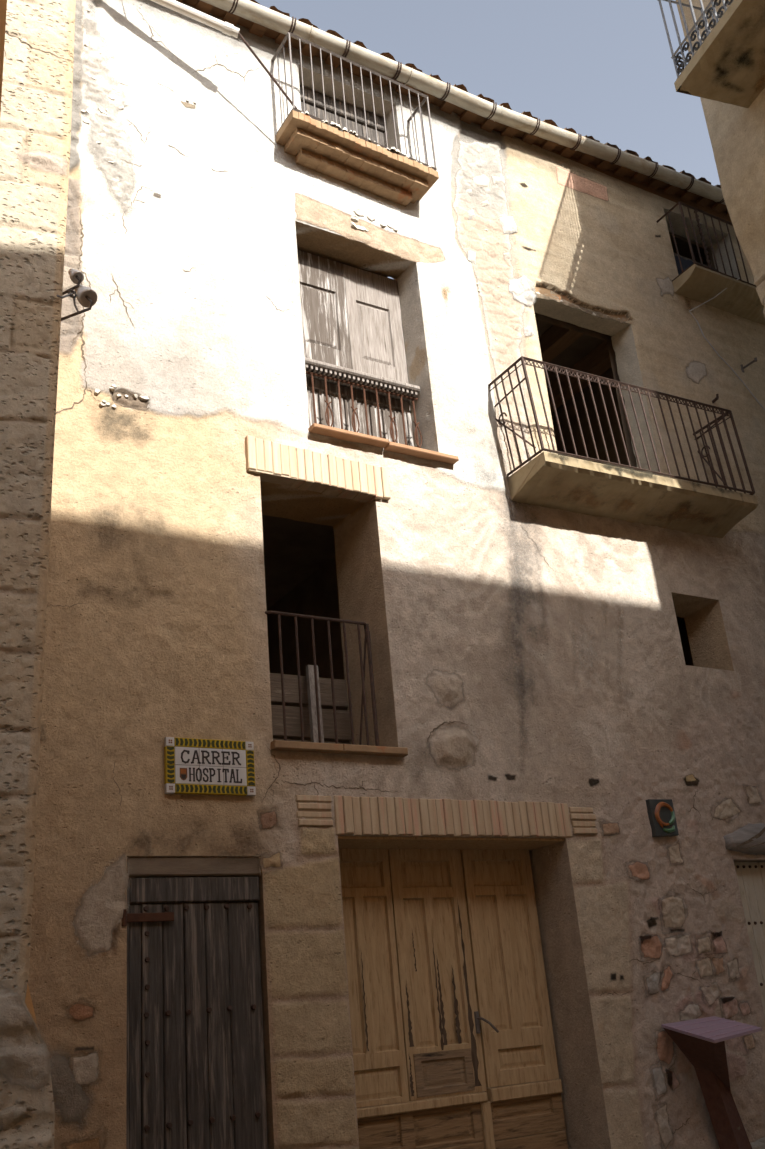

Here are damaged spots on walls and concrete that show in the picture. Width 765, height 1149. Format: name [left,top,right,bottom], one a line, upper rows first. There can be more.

peeling [78,0,135,212]
crack [56,212,135,413]
flaking render [453,141,540,479]
leakage [104,407,141,435]
crack [262,744,403,803]